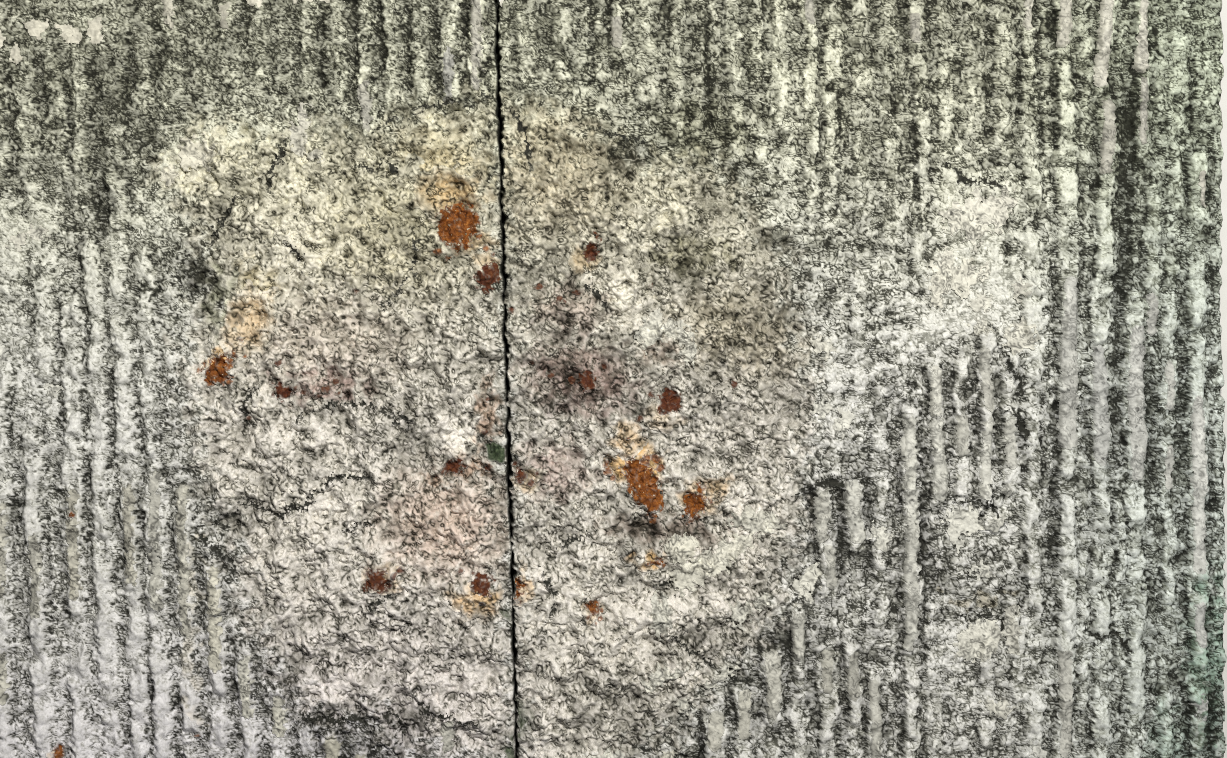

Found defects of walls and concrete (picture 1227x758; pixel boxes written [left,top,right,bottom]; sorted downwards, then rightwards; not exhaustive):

rust [409,163,501,294]
rust [534,230,603,305]
rust [196,279,342,403]
rust [528,360,608,396]
rust [599,387,743,525]
rust [361,558,411,596]
rust [442,560,536,627]